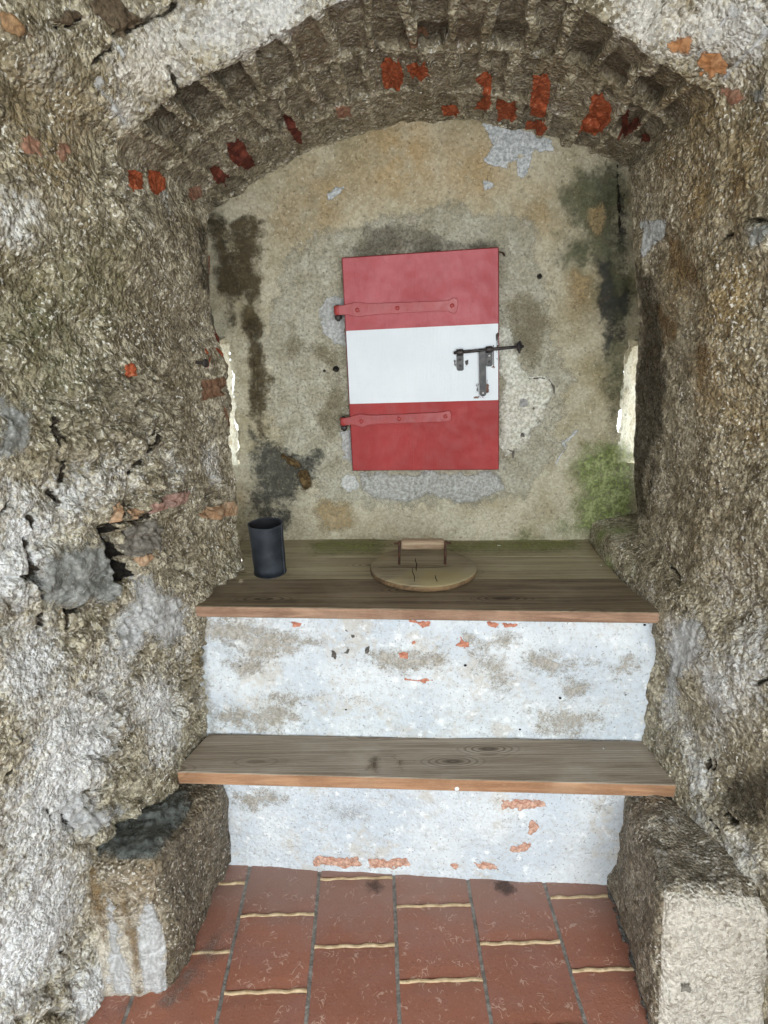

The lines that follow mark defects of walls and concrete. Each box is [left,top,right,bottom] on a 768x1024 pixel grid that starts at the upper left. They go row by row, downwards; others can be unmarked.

flaking render [380,57,429,91]
flaking render [283,114,302,144]
flaking render [442,104,460,117]
flaking render [474,72,554,178]
flaking render [578,92,650,142]
flaking render [208,138,256,187]
flaking render [128,170,166,196]
flaking render [326,186,345,200]
water stain [199,213,322,530]
flaking render [501,799,545,853]
flaking render [313,856,410,870]
flaking render [474,862,497,870]